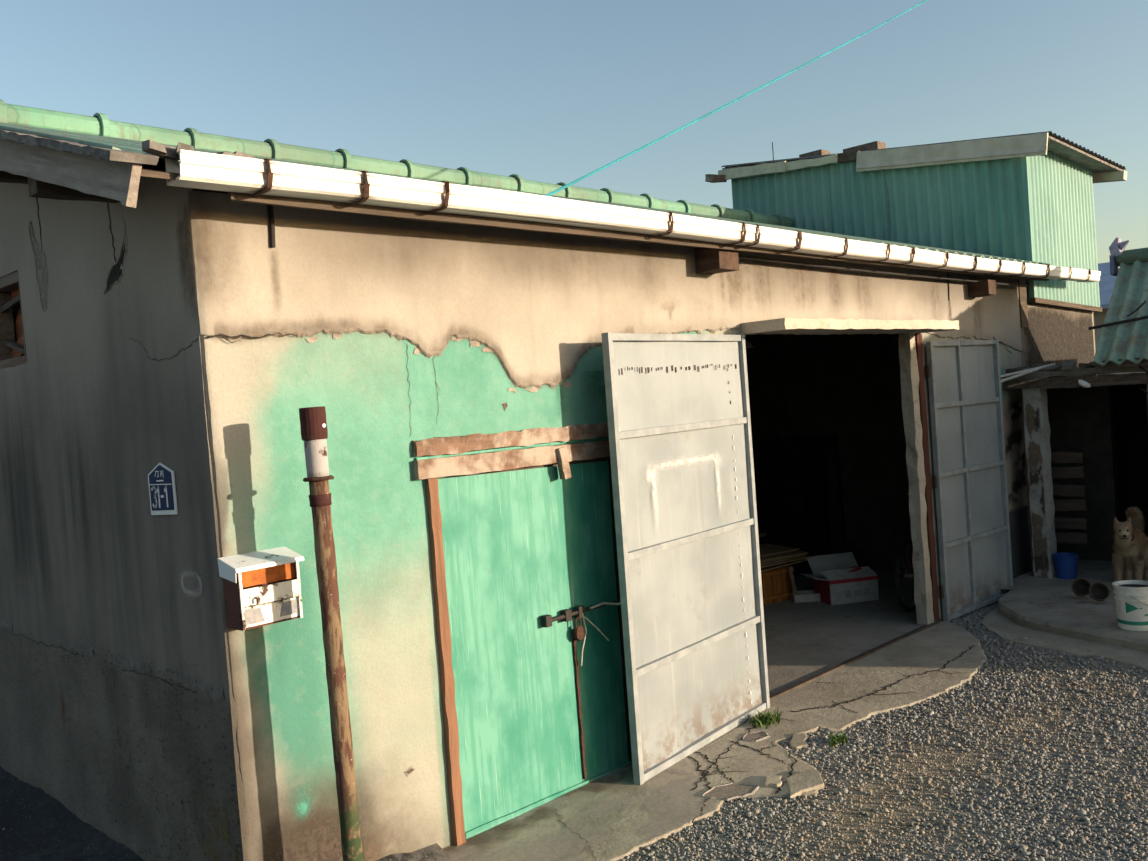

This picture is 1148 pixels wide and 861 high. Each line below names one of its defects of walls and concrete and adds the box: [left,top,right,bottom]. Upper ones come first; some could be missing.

crack [107,202,126,262]
crack [134,332,298,362]
peeling [209,328,602,412]
peeling [654,326,730,334]
peeling [1026,403,1048,578]
crack [687,645,974,827]
damp [263,806,343,861]